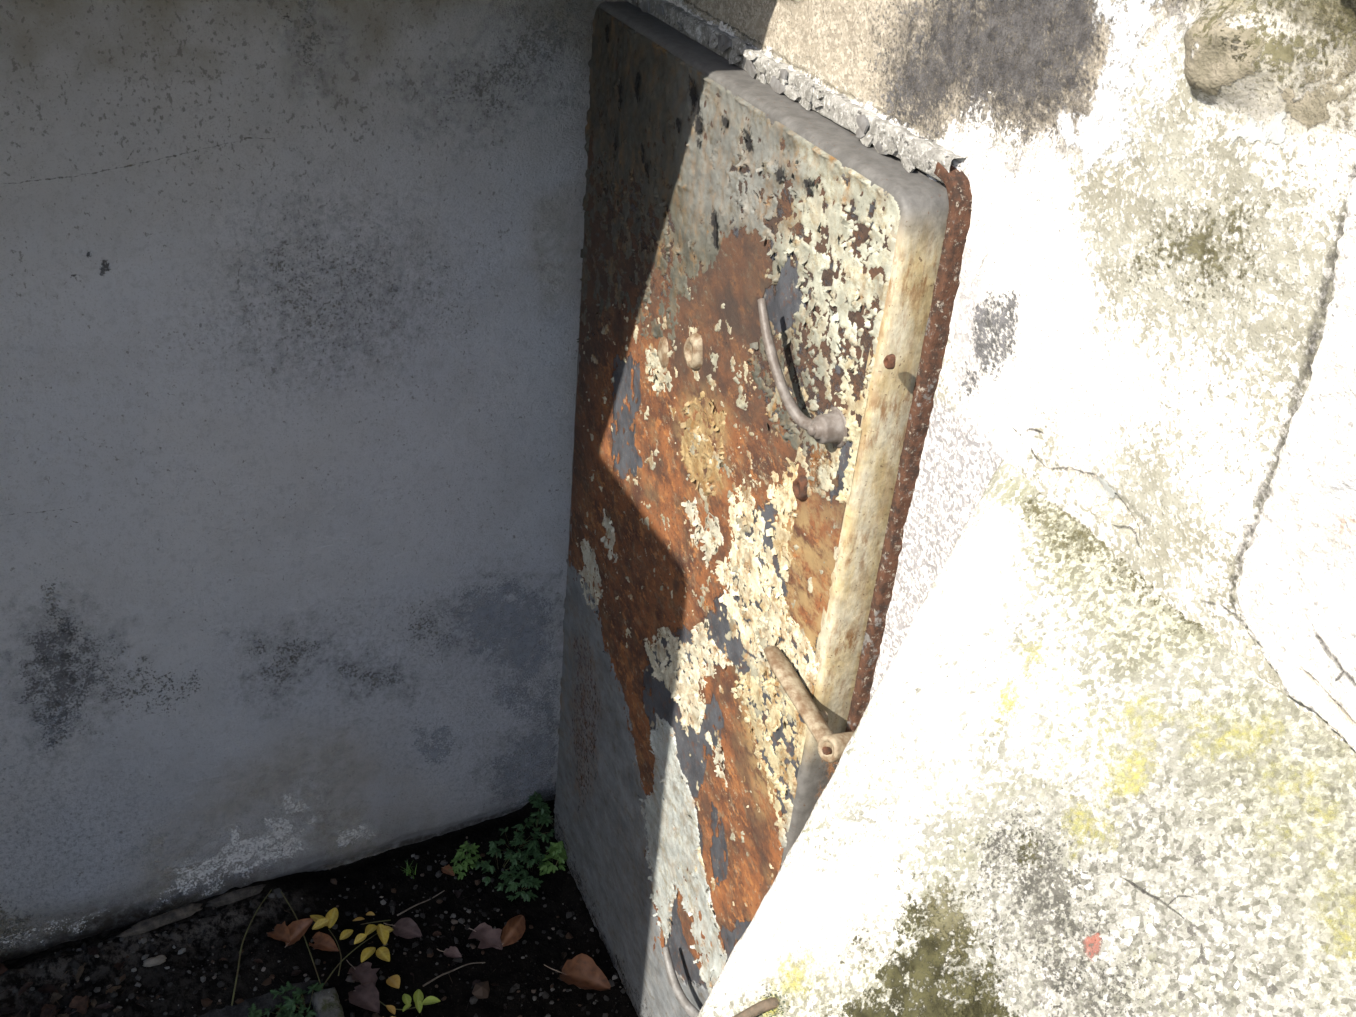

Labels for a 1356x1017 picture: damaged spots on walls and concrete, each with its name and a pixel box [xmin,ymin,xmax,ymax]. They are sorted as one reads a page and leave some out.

damp [857,0,1356,401]
mould [8,579,204,751]
mould [402,573,561,807]
corrosion [653,891,665,954]
peeling [554,0,900,1017]
corrosion [568,13,892,810]
corrosion [675,657,787,970]
damp [910,872,1014,1017]